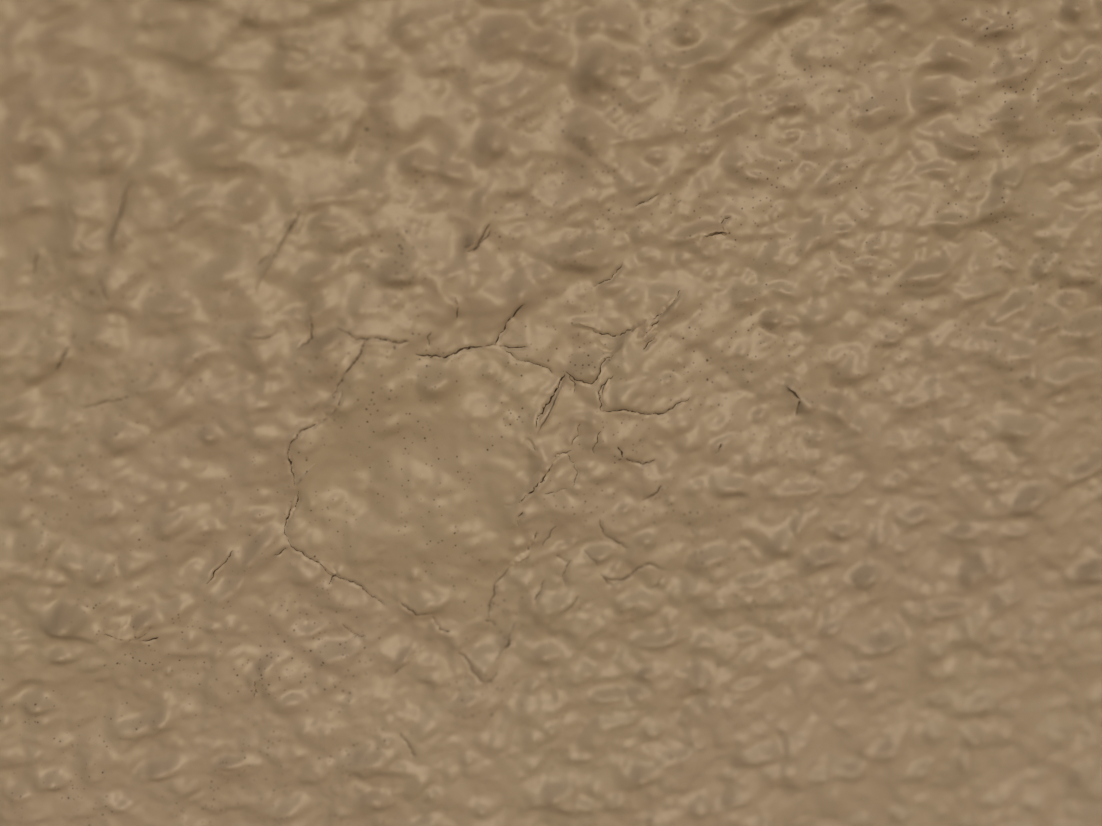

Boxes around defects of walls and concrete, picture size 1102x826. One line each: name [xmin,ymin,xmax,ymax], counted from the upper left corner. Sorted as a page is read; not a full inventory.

crack [275,299,690,685]